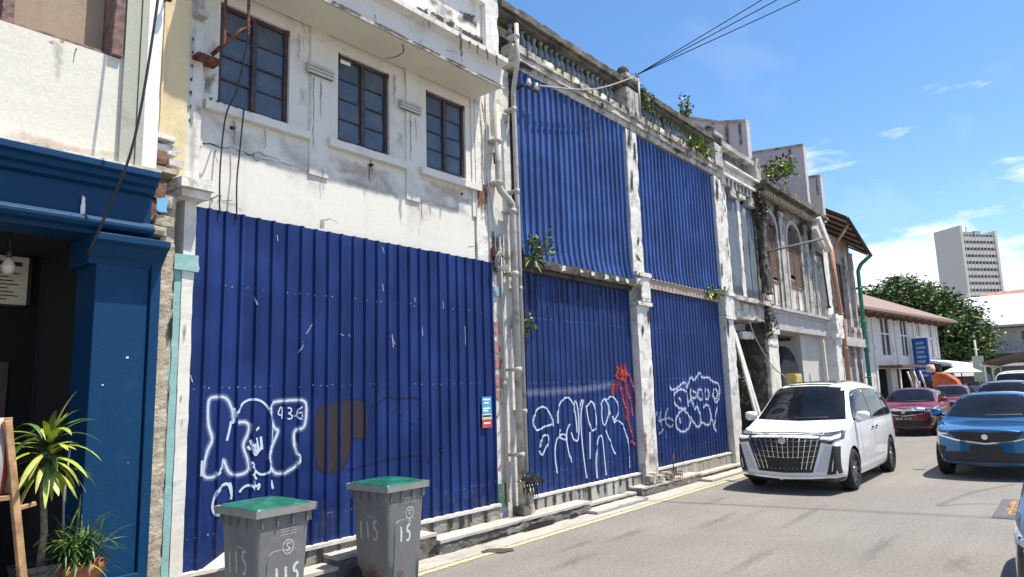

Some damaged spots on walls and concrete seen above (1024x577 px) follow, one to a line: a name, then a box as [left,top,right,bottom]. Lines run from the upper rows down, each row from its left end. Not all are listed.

crack [202,143,298,167]